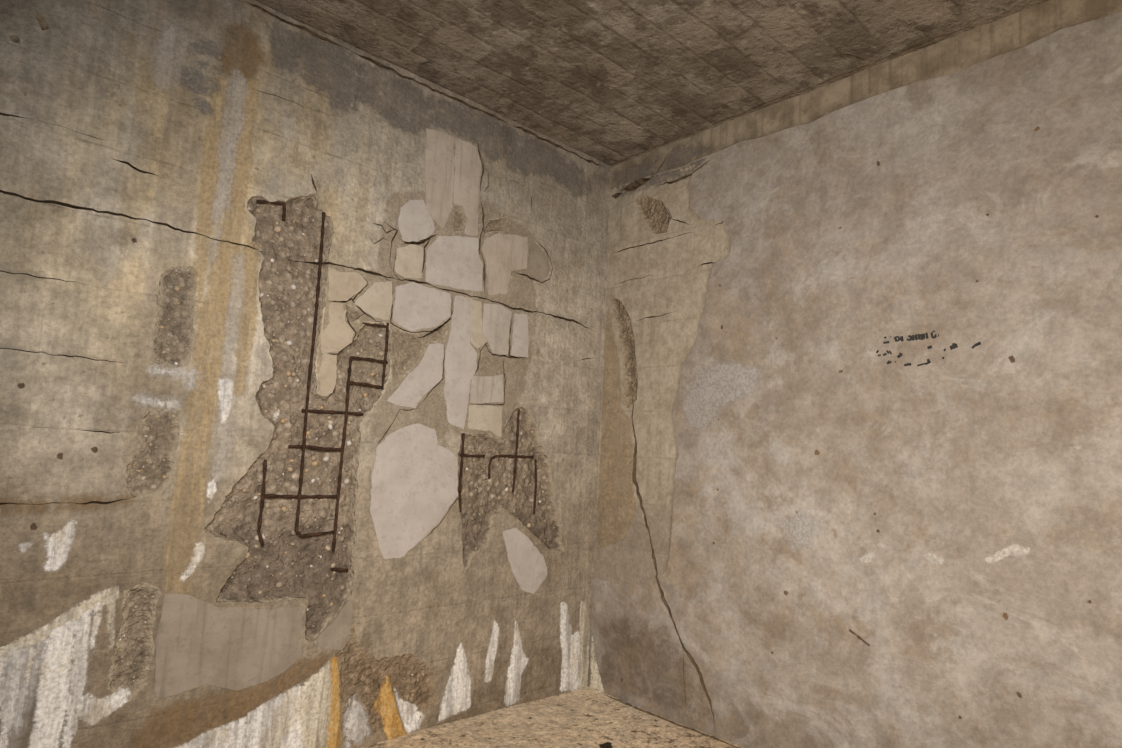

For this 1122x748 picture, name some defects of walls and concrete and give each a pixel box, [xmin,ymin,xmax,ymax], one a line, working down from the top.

crack [0,112,158,176]
crack [243,0,1035,253]
corrosion [171,36,260,525]
crack [0,140,592,448]
leakage [0,588,130,748]
crack [0,496,135,505]
leakage [137,657,424,748]
flaking render [154,128,564,748]
leakage [439,621,499,721]
leakage [504,621,529,706]
leakage [560,601,604,692]
crack [604,403,739,748]